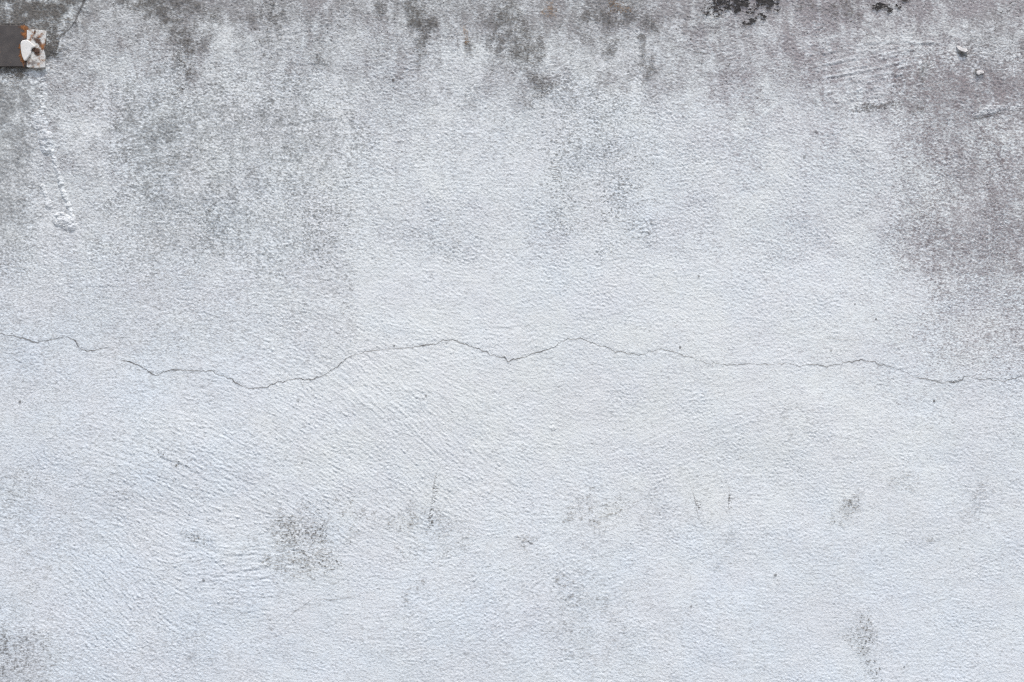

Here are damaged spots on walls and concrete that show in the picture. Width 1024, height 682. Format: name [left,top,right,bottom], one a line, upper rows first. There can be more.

rust [18,25,45,64]
leakage [0,0,79,59]
leakage [120,0,216,90]
leakage [405,1,437,62]
leakage [480,4,556,106]
leakage [580,0,656,77]
mould [702,0,780,25]
mould [831,0,910,16]
leakage [0,67,40,249]
leakage [115,93,208,204]
leakage [853,57,1024,292]